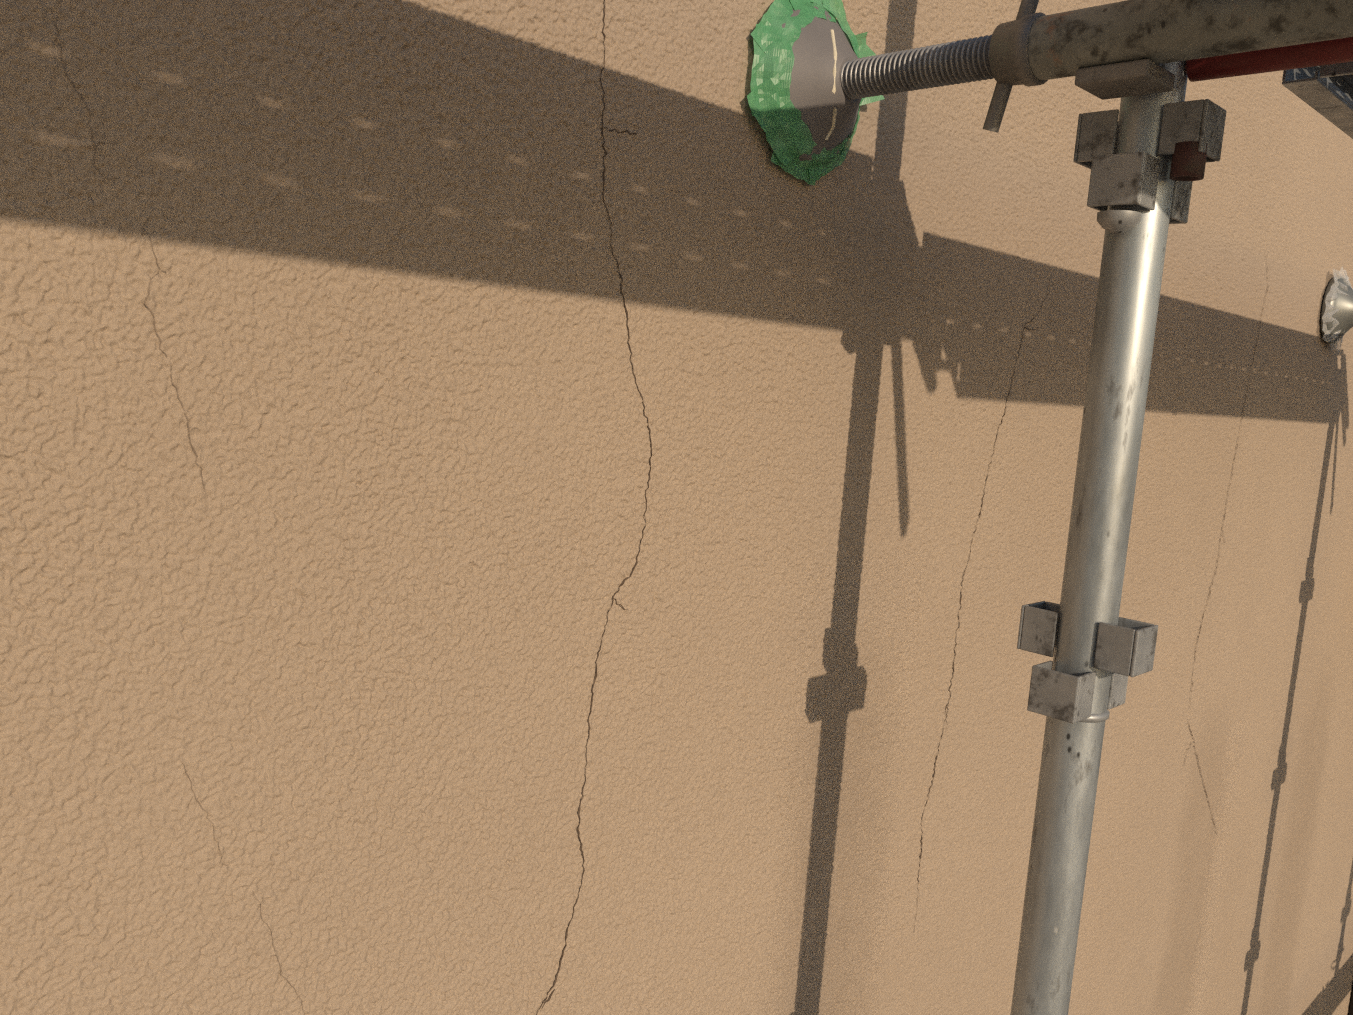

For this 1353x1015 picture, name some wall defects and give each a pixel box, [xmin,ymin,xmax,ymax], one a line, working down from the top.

crack [537,5,652,1014]